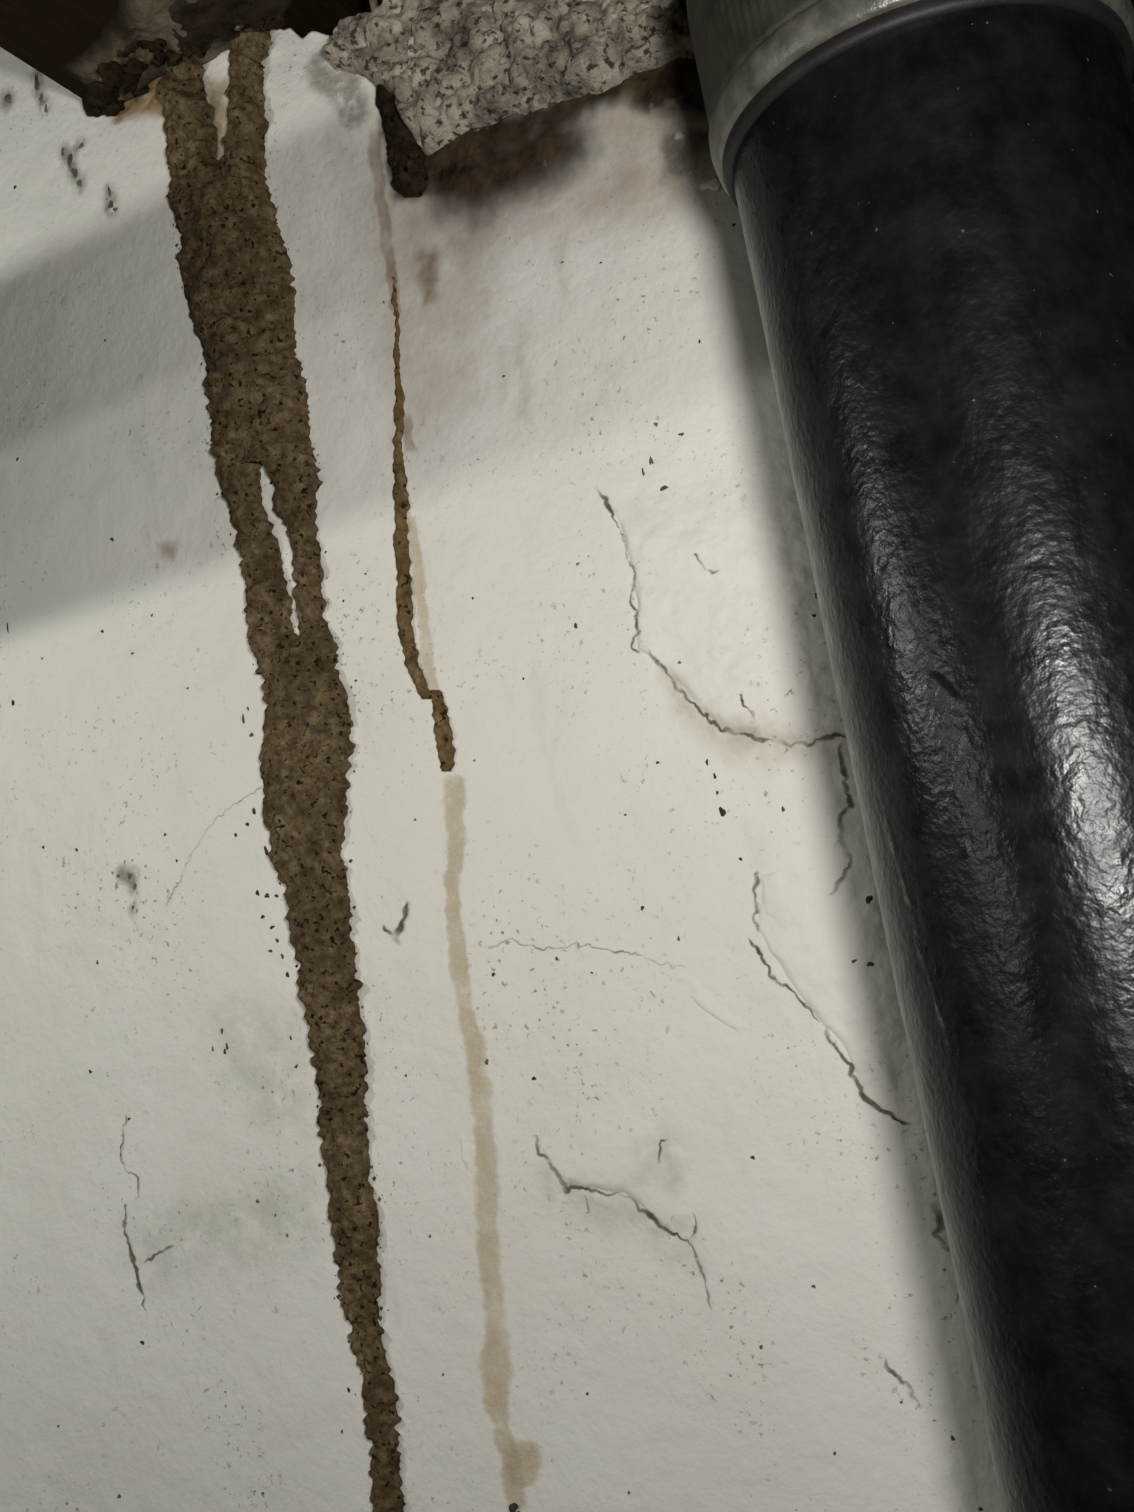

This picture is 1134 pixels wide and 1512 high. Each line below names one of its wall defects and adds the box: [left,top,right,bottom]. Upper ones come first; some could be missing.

spalling [313,0,706,207]
peeling [663,130,722,192]
crack [601,495,618,527]
crack [629,568,767,742]
crack [808,733,853,826]
damp [445,779,467,979]
damp [461,1012,485,1093]
crack [749,877,906,1125]
crack [536,1144,707,1289]
damp [483,1324,536,1503]